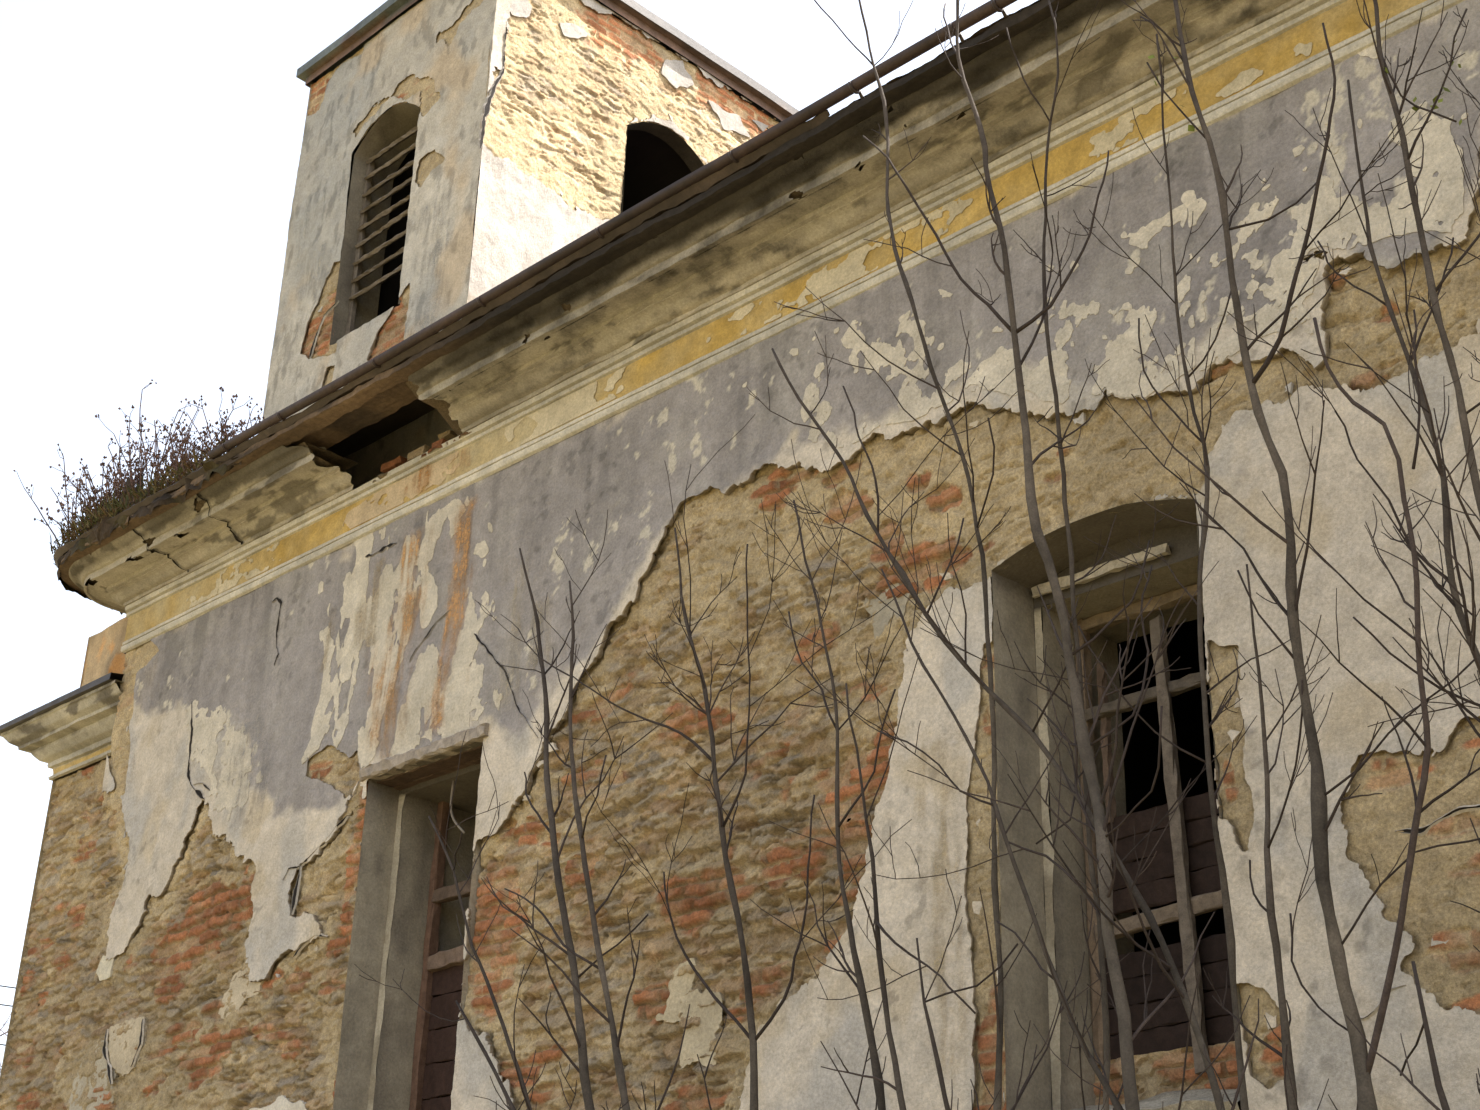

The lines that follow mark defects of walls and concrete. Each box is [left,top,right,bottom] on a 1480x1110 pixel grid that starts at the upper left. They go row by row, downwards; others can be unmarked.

spalling [308,47,364,116]
spalling [353,74,441,145]
spalling [436,0,483,46]
spalling [483,0,779,220]
peeling [1089,88,1186,158]
peeling [1216,68,1263,98]
peeling [1358,40,1383,59]
spalling [415,149,445,187]
spalling [300,251,342,387]
spalling [367,283,410,361]
spalling [460,101,1480,1110]
spalling [0,430,503,1110]